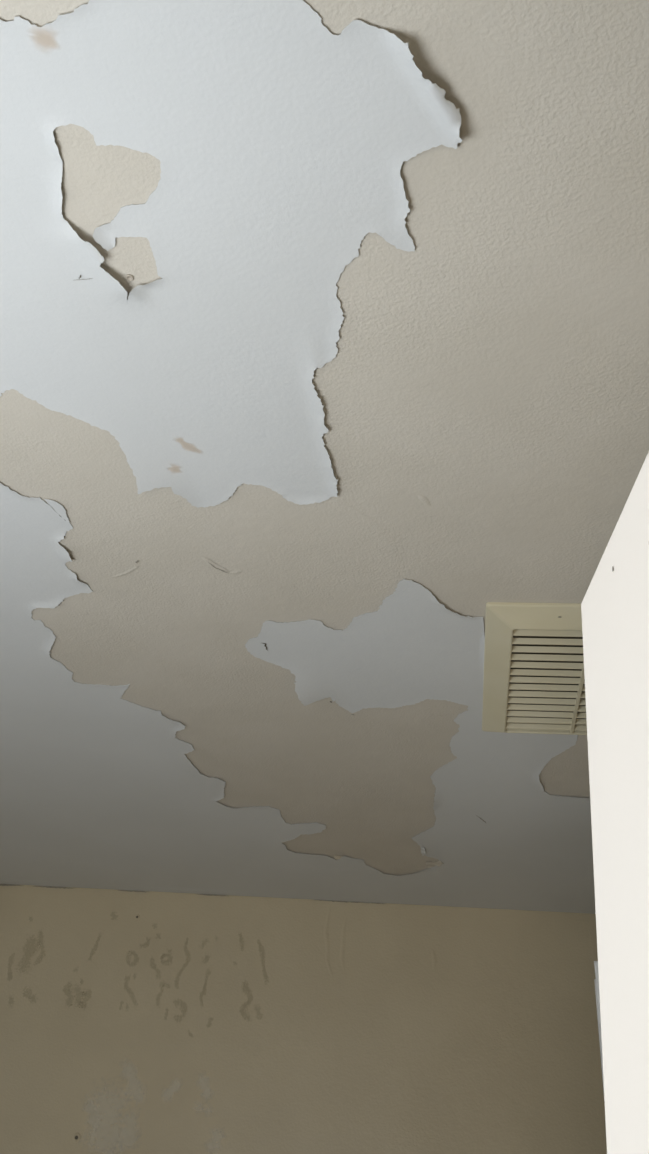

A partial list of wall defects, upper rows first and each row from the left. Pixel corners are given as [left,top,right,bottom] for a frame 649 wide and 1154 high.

peeling [0,0,596,914]